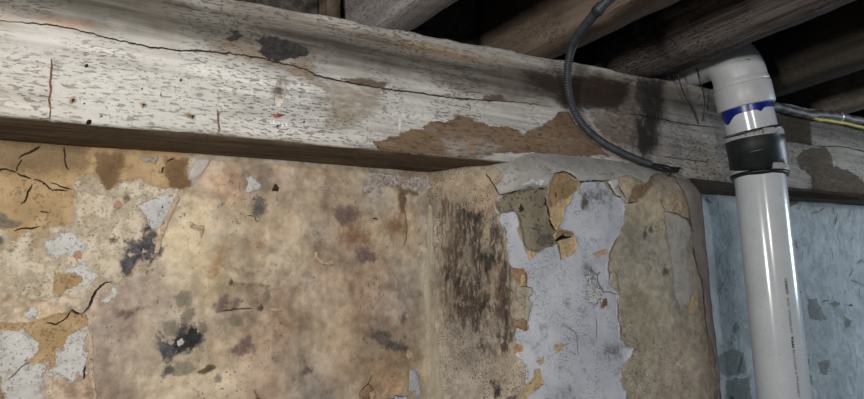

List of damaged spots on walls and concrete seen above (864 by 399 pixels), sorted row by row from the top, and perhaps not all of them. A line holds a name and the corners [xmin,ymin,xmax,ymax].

damp [255,35,312,75]
crack [0,146,70,231]
damp [776,114,864,200]
crack [45,282,109,325]
spalling [0,140,190,399]
damp [110,226,164,275]
damp [157,292,221,382]
peeling [391,350,420,399]
damp [437,200,513,352]
peeling [493,173,634,399]